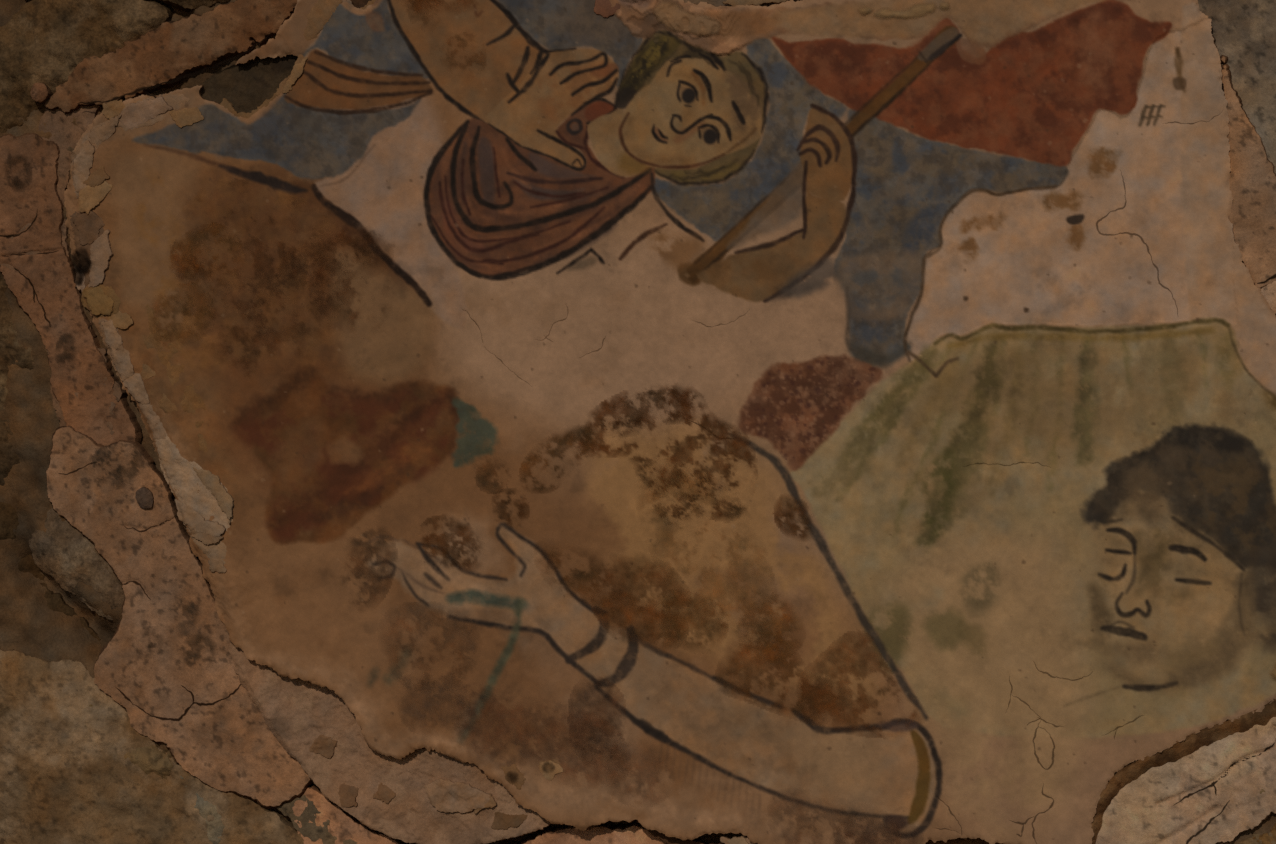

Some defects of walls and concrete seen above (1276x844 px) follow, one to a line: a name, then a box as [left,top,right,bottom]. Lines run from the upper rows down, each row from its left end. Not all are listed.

water stain [522,388,753,517]
water stain [424,524,470,567]
water stain [775,502,808,538]
spalling [1090,699,1276,844]